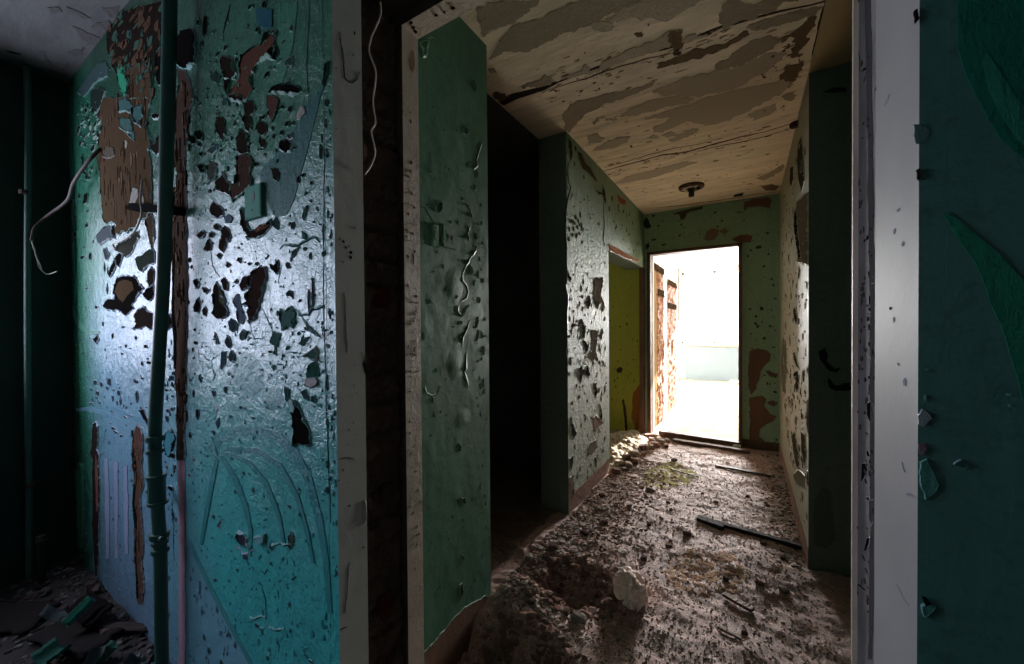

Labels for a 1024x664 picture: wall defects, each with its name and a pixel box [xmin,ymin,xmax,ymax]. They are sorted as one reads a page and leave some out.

flaking render [47,0,162,355]
flaking render [163,0,332,491]
peeling [566,267,606,497]
spalling [611,433,670,475]
peeling [476,0,823,262]
peeling [705,135,809,521]